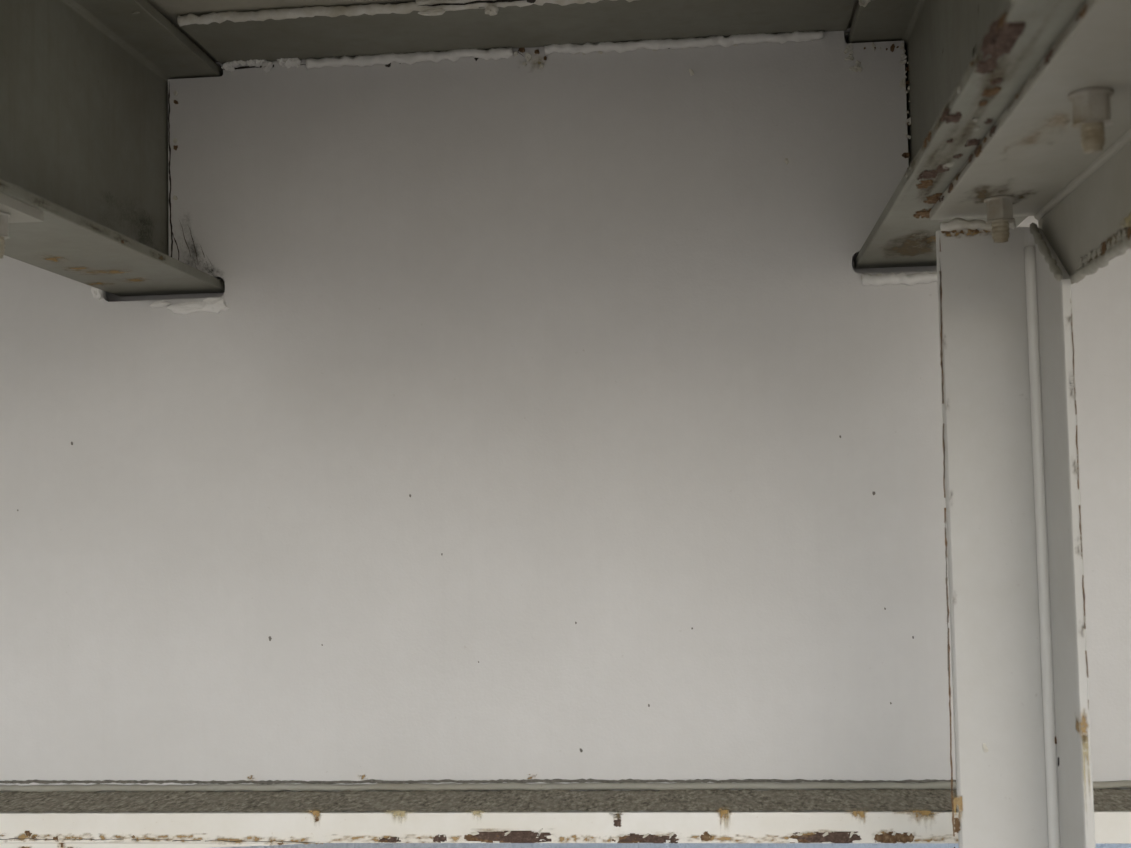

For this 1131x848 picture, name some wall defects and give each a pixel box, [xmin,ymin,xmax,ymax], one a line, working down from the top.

corrosion [978,12,1026,60]
corrosion [940,108,962,124]
corrosion [913,193,942,219]
corrosion [887,229,990,404]
corrosion [0,423,963,848]
corrosion [1075,715,1090,784]